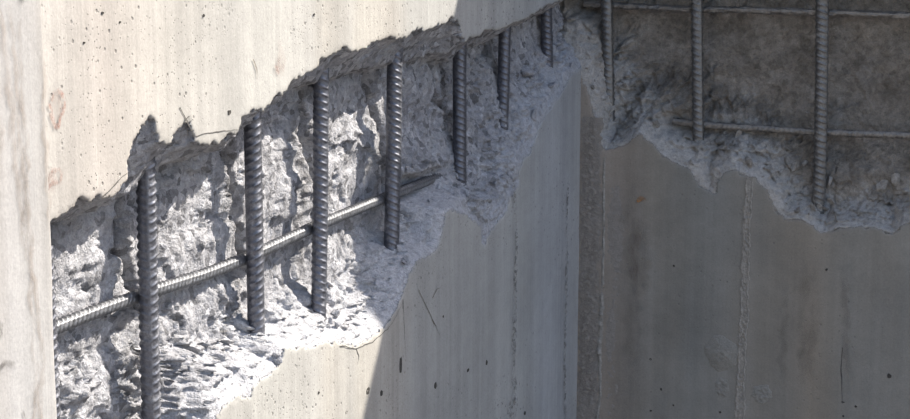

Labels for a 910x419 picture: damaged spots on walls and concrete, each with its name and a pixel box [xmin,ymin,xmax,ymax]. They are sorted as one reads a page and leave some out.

spalling [50,2,581,419]
spalling [558,0,910,234]